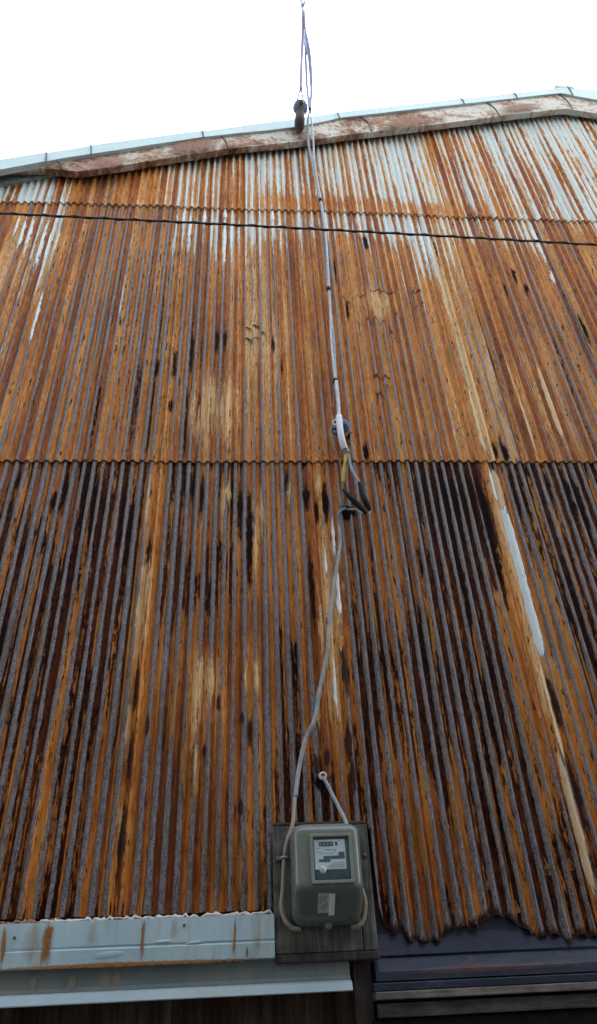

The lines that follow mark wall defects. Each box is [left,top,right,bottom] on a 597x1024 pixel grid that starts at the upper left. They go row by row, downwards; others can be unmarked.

rust [83,156,130,169]
rust [172,138,215,153]
rust [132,658,150,737]
rust [169,674,206,802]
rust [238,711,252,749]
rust [340,644,350,695]
rust [344,720,357,796]
rust [544,671,563,727]
rust [114,734,133,894]
rust [563,745,597,881]
rust [220,833,243,903]
rust [0,922,260,970]